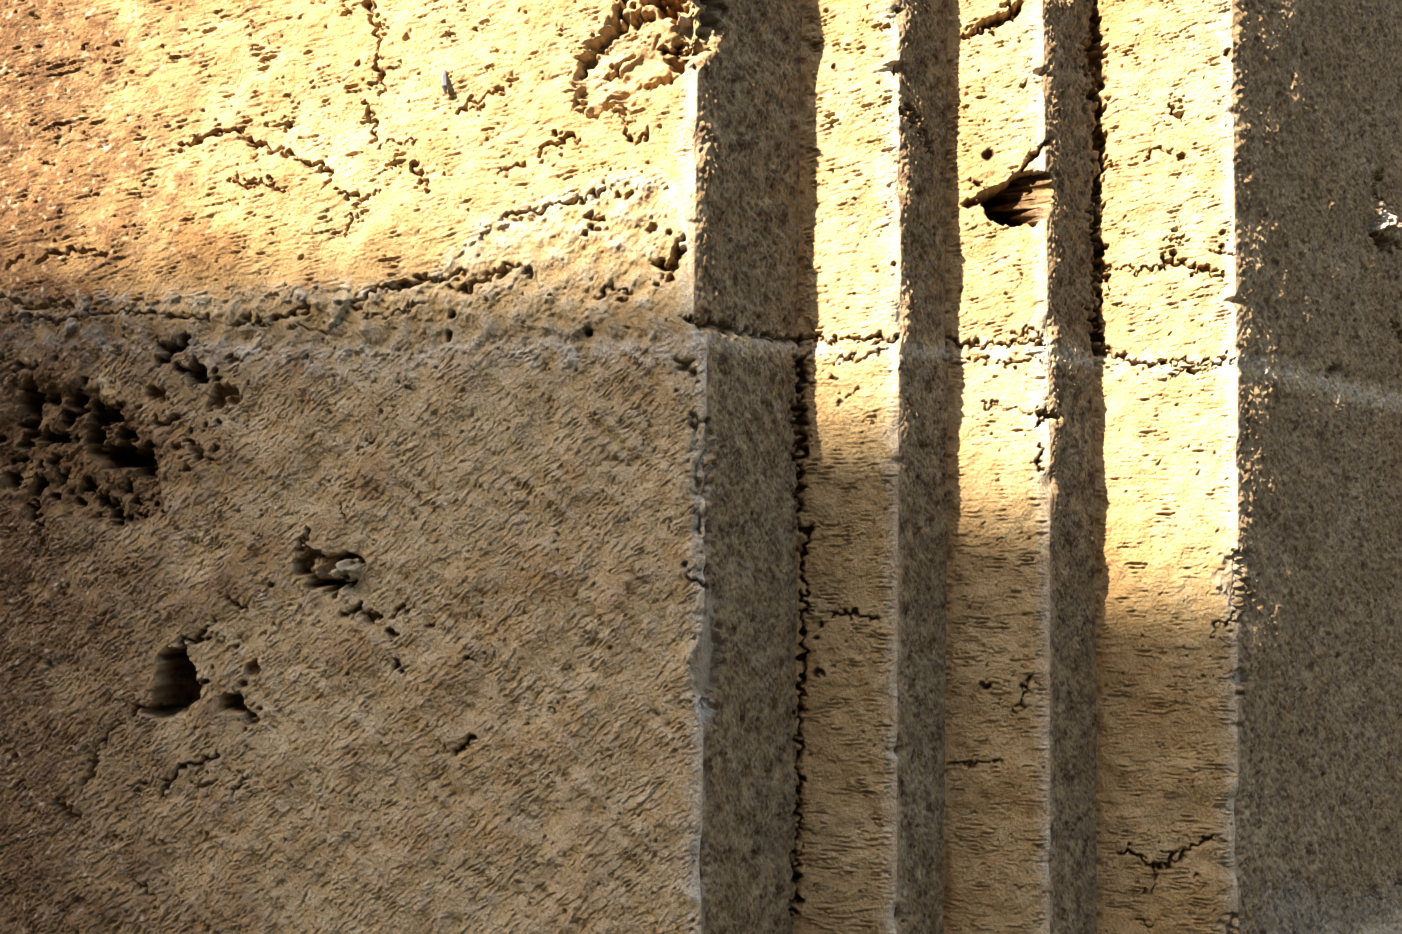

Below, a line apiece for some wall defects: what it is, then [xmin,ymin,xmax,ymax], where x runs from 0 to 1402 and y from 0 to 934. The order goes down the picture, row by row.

crack [354,0,431,194]
spalling [569,0,728,121]
crack [175,125,382,238]
spalling [962,139,1054,228]
spalling [0,293,76,315]
spalling [171,352,244,382]
spalling [0,343,222,530]
spalling [294,551,411,639]
spalling [131,637,210,720]
spalling [219,643,263,732]
spalling [390,658,405,674]